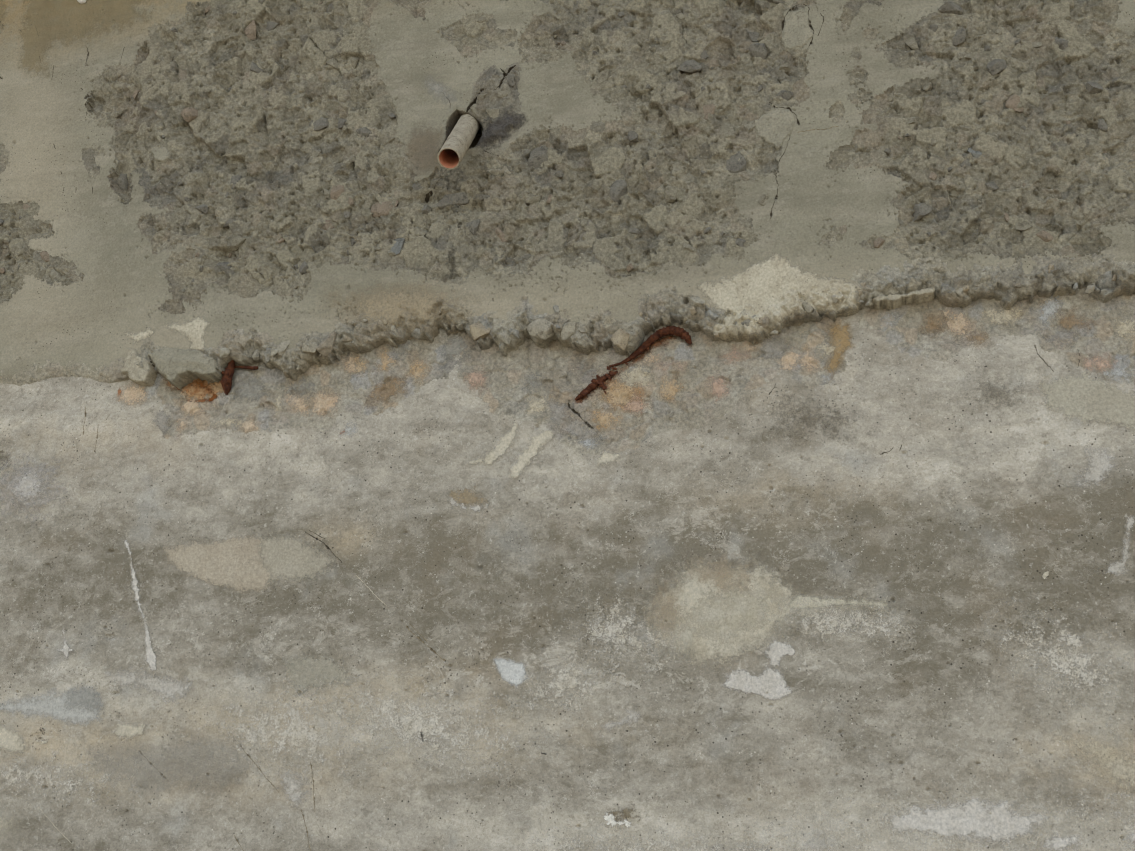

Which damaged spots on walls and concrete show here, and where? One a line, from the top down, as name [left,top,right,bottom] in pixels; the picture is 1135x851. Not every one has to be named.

spalling [0,0,1135,455]
corrosion [163,360,258,403]
corrosion [575,326,692,412]